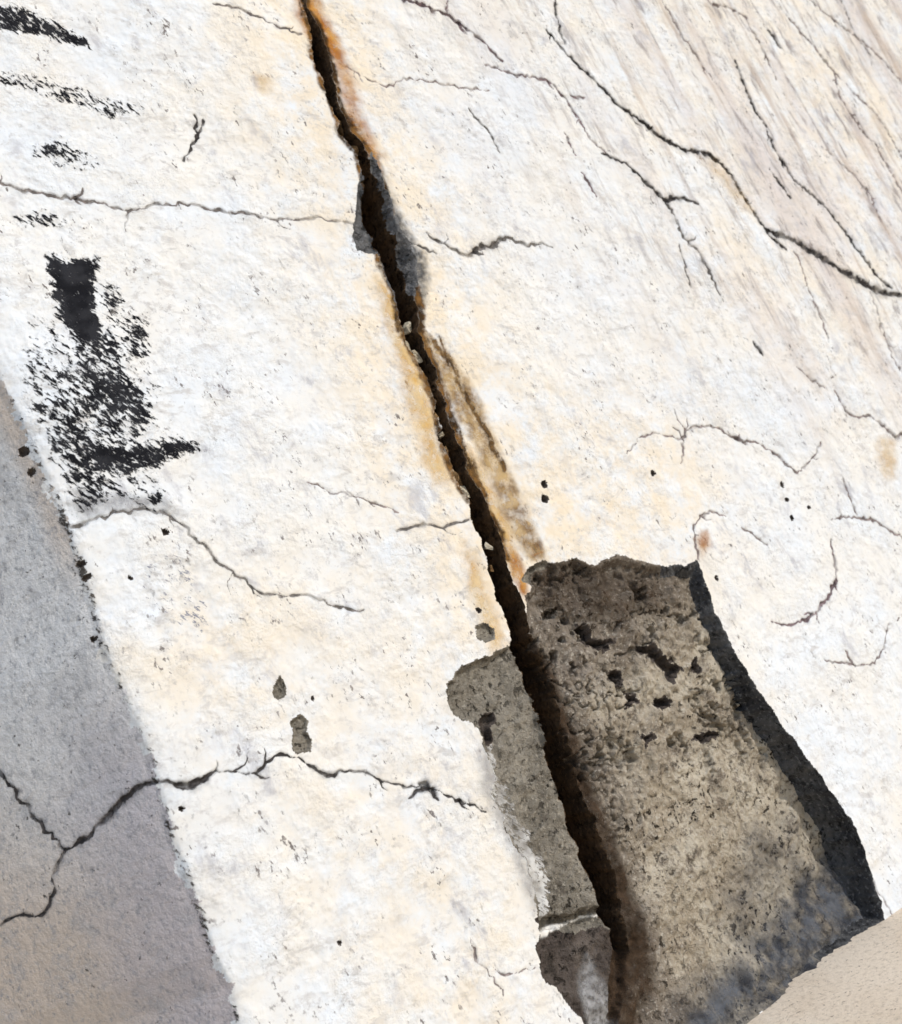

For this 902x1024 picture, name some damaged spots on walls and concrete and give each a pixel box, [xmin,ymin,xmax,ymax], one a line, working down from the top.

corrosion [299,0,378,163]
crack [0,175,336,231]
corrosion [382,285,444,478]
crack [72,507,301,598]
corrosion [468,456,527,594]
crack [213,0,902,953]
crack [0,748,486,923]
flaking render [272,675,287,700]
flaking render [290,714,312,754]
flaking render [446,554,885,1024]
crack [471,945,535,996]